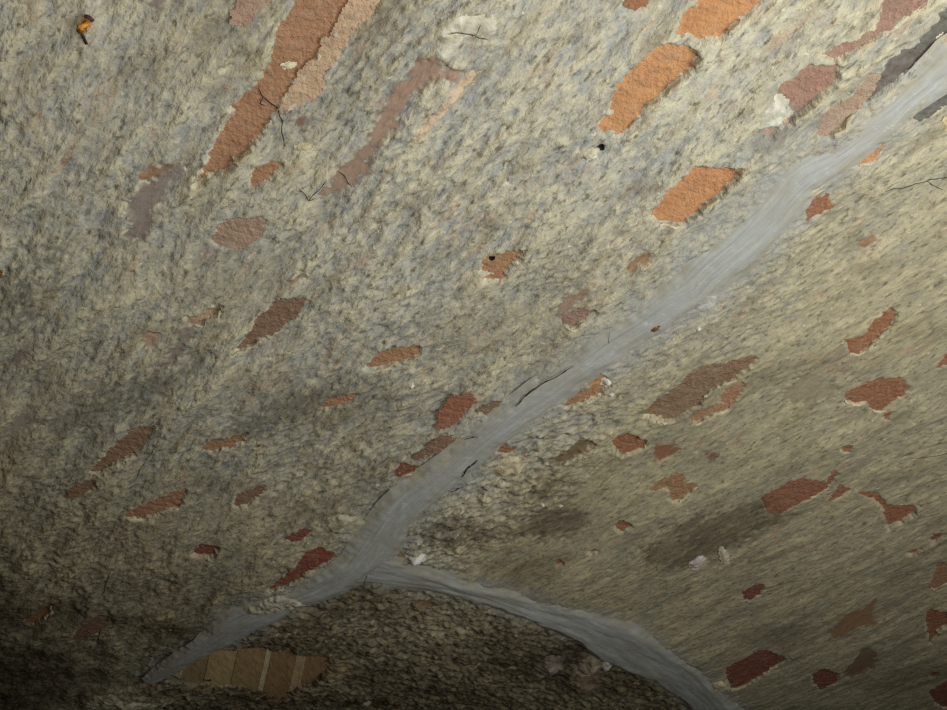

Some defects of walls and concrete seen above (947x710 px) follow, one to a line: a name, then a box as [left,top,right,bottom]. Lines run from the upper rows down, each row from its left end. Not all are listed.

spalling [197,0,380,181]
spalling [597,0,765,134]
spalling [758,0,928,137]
spalling [250,160,282,187]
spalling [651,166,739,230]
spalling [233,298,306,356]
crack [515,366,573,407]
spalling [642,355,756,426]
spalling [844,377,910,419]
spalling [761,470,915,525]
spalling [711,650,785,693]
spalling [929,672,947,709]